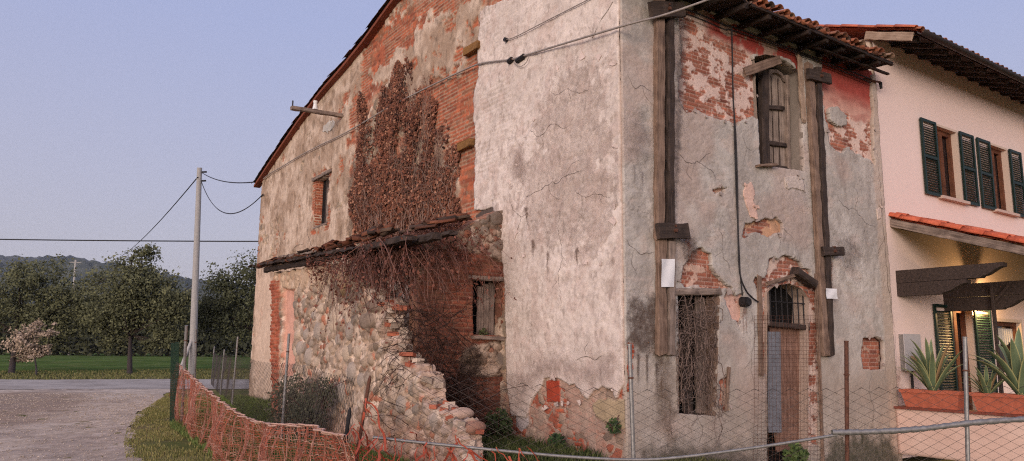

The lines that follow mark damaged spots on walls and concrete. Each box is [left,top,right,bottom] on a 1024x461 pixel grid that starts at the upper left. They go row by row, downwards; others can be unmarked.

flaking render [678,10,807,126]
flaking render [821,55,876,163]
flaking render [742,182,782,238]
flaking render [678,248,741,324]
flaking render [512,342,634,461]
flaking render [754,256,822,446]
flaking render [861,335,885,370]